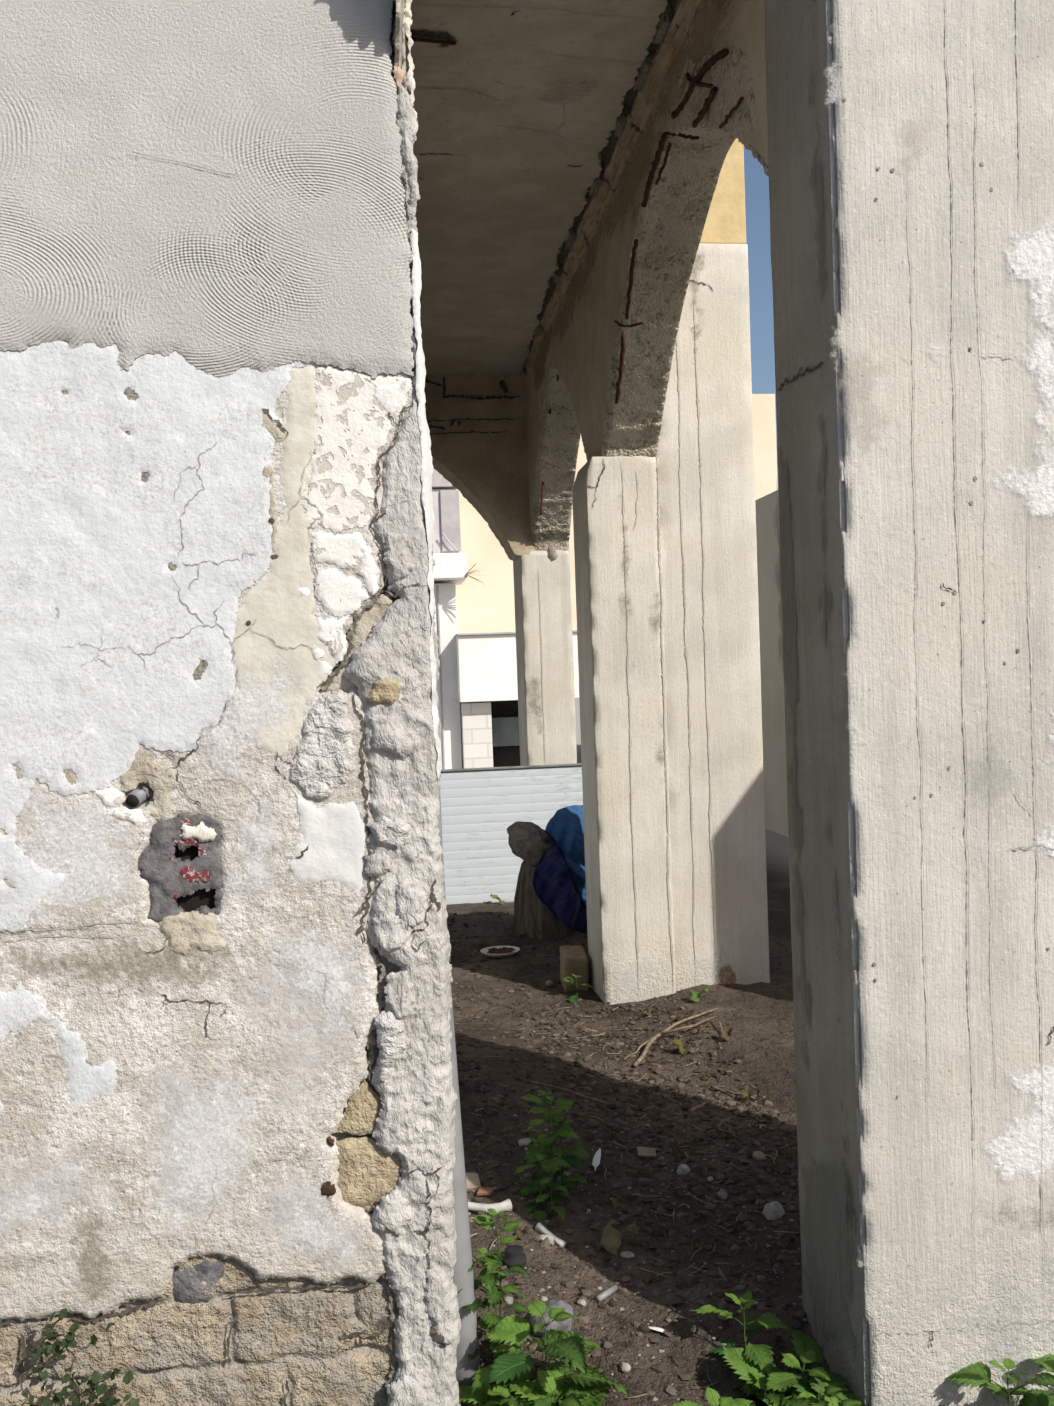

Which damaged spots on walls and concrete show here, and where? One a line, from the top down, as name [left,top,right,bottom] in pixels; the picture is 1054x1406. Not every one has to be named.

spalling [523,0,757,375]
leakage [994,222,1054,516]
peeling [231,365,415,760]
flaking render [95,749,179,826]
crack [61,377,520,1080]
leakage [1035,830,1054,856]
peeling [0,985,118,1108]
peeling [384,970,414,1022]
corrosion [320,1181,336,1198]
flaking render [336,1080,412,1237]
crack [405,1167,442,1270]
leakage [984,1060,1054,1181]